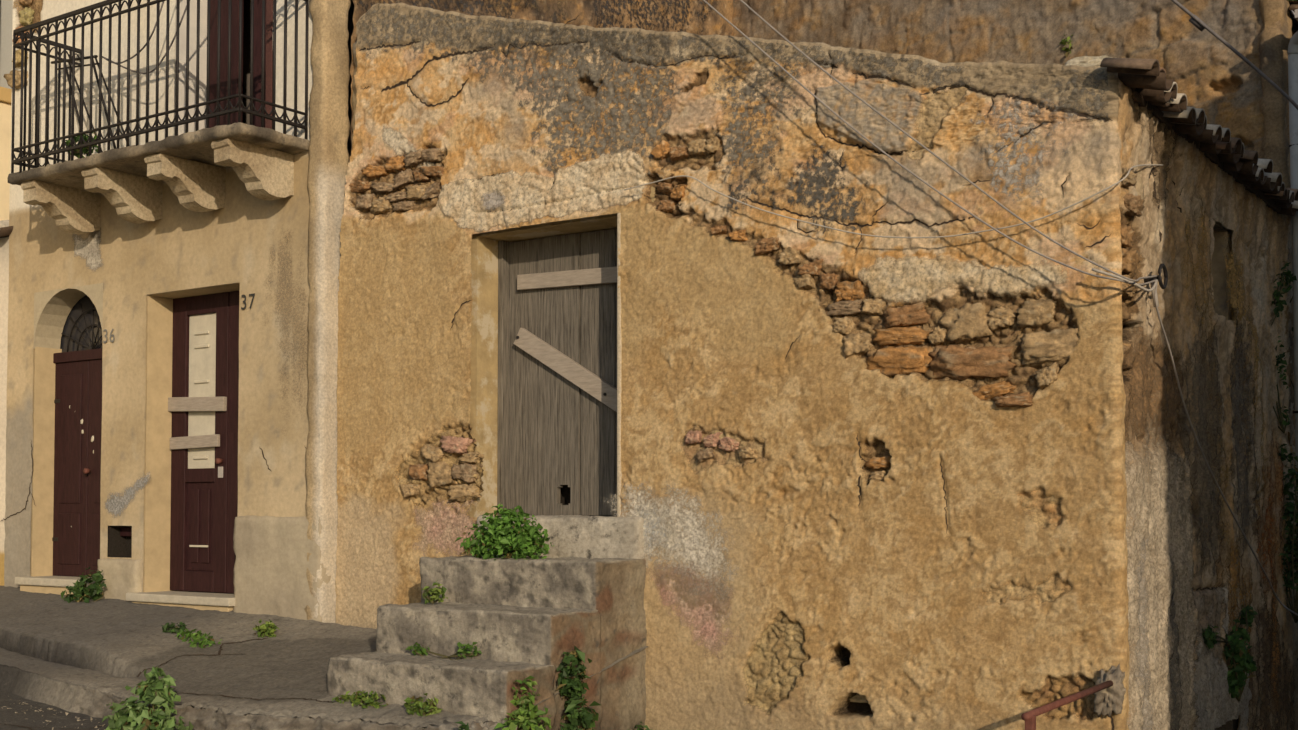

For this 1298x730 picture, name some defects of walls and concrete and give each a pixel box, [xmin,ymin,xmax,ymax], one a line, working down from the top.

crack [359,15,743,107]
damp [357,0,971,233]
spalling [349,142,447,220]
spalling [646,129,1079,408]
spalling [396,423,484,507]
spalling [680,425,768,474]
damp [1125,201,1267,730]
spalling [831,647,851,666]
spalling [833,693,873,715]